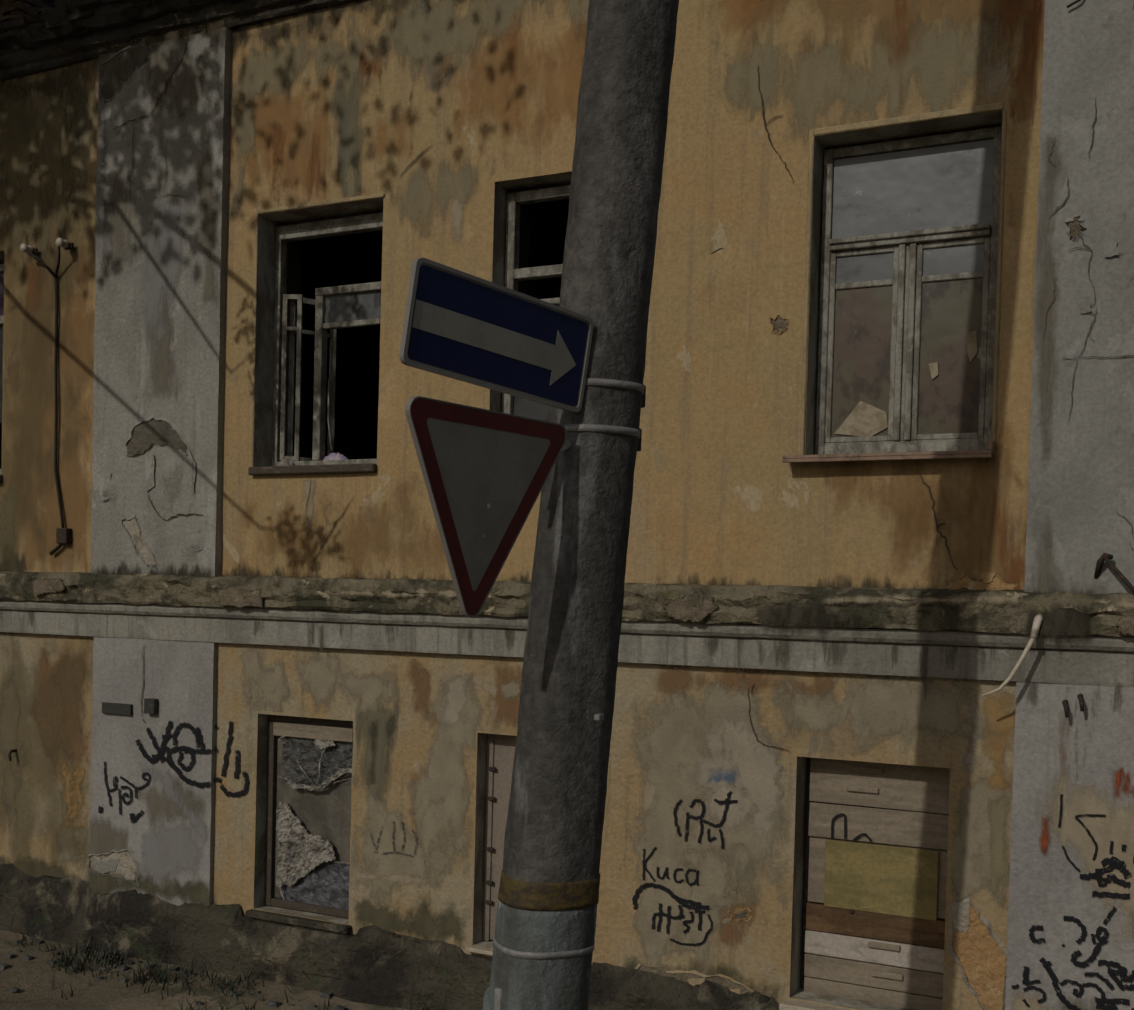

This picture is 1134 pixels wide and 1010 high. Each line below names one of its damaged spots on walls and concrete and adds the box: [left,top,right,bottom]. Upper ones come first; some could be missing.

crack [102,31,188,206]
leakage [0,0,541,300]
crack [757,65,794,182]
leakage [724,10,1010,140]
leakage [143,202,183,393]
flaking render [125,414,196,493]
crack [313,497,354,562]
crack [919,474,959,570]
leakage [1050,775,1134,931]
leakage [356,900,462,942]
leakage [1013,996,1101,1010]